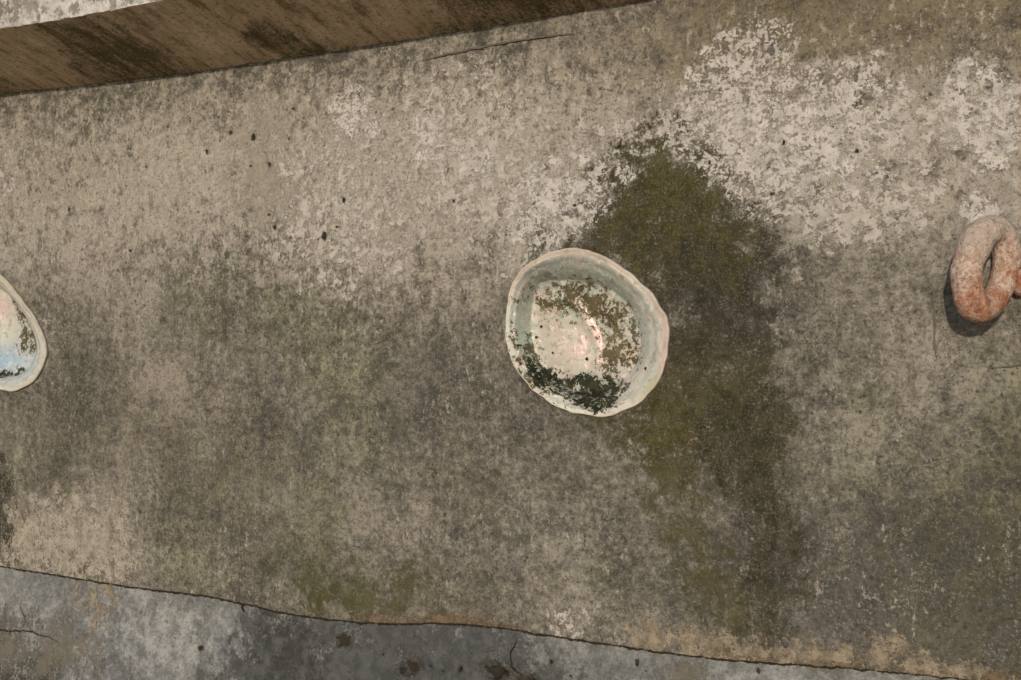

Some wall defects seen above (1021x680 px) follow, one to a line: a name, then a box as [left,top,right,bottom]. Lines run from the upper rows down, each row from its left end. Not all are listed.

leakage [0,476,149,585]
leakage [628,384,815,651]
crack [0,566,969,680]
spalling [622,620,991,680]